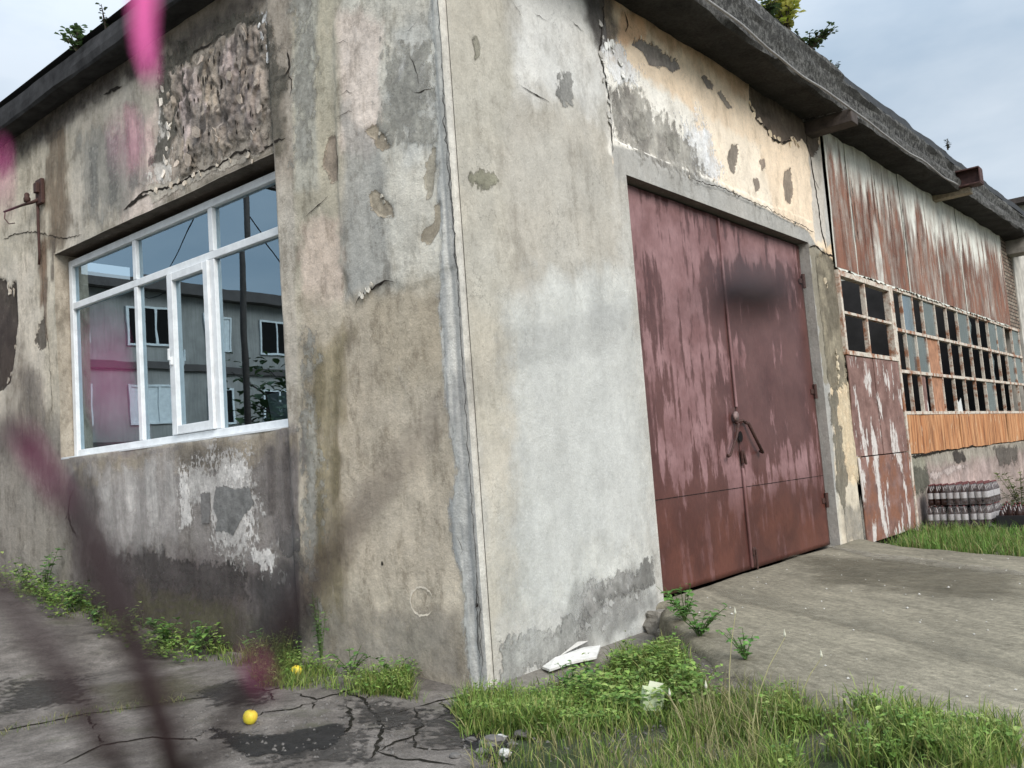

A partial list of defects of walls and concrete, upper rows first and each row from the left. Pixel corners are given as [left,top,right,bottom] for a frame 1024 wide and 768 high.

spalling [146,85,259,204]
crack [123,132,285,211]
spalling [364,124,391,151]
spalling [369,189,394,218]
spalling [421,147,441,245]
peeling [601,35,738,192]
corrosion [828,150,1011,326]
peeling [0,278,18,391]
water stain [69,326,344,653]
peeling [177,439,285,585]
water stain [499,556,655,683]